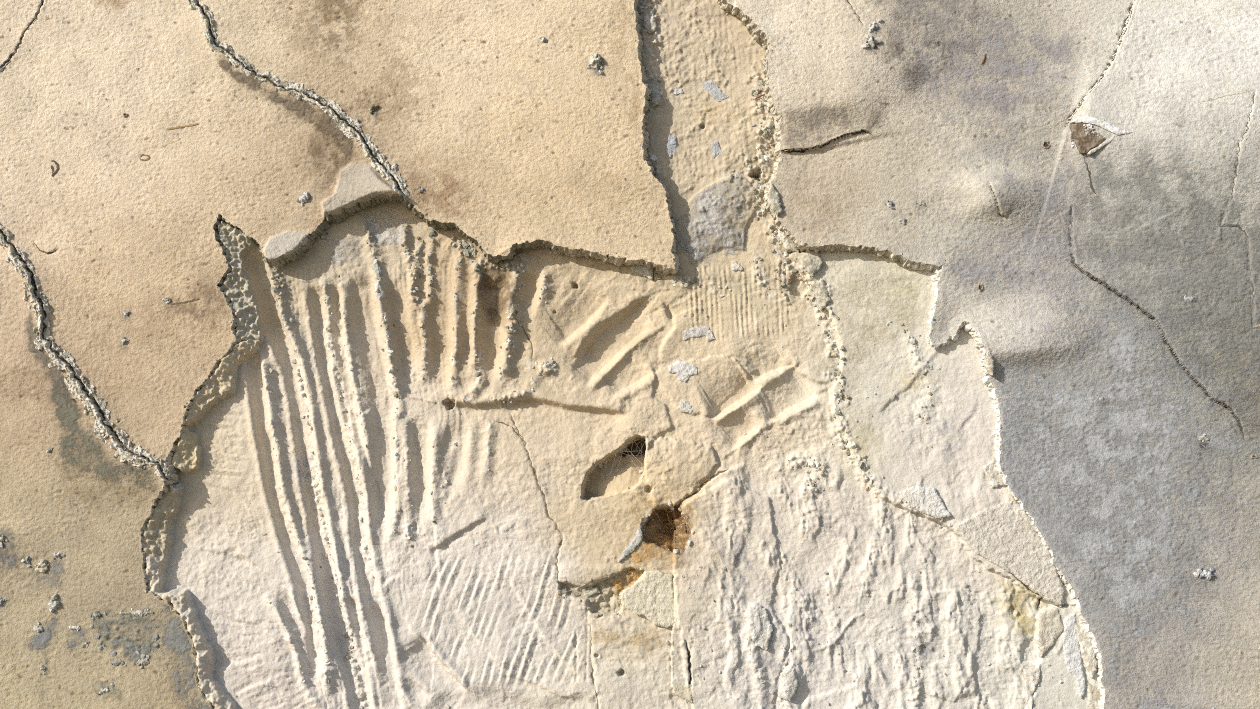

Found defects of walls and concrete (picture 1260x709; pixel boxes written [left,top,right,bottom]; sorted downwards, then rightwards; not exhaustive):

crack [0,0,44,71]
crack [186,0,409,206]
crack [1067,0,1135,125]
crack [1219,93,1255,320]
crack [0,223,185,493]
flaking render [140,0,1108,709]
crack [1069,207,1244,436]
corrosion [613,504,693,594]